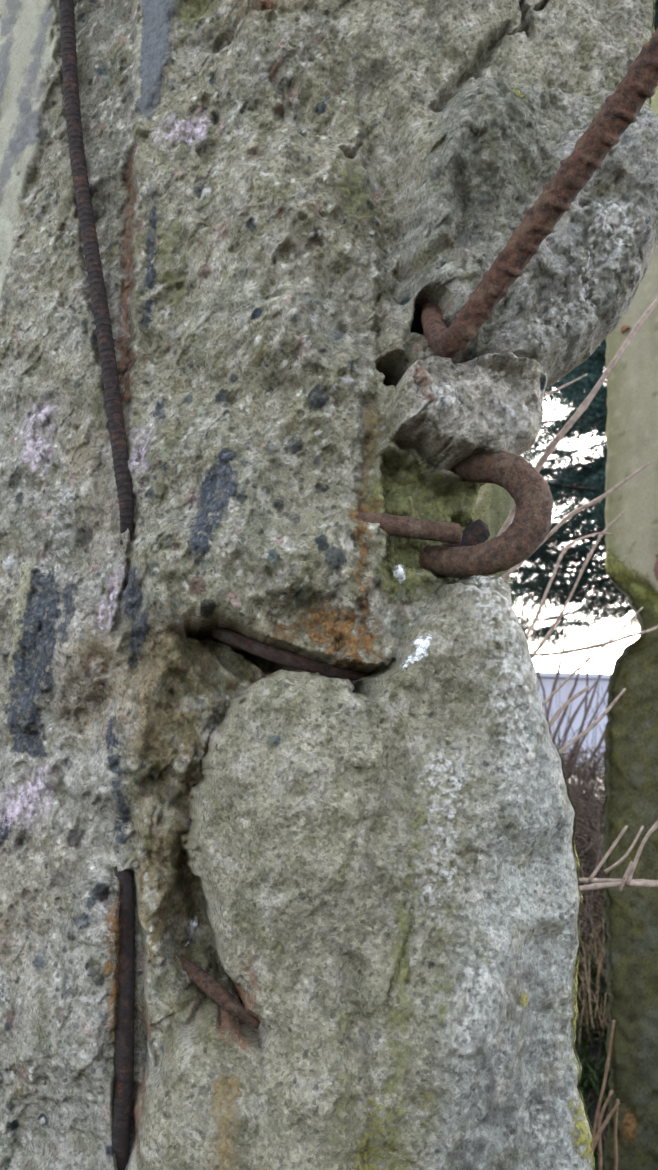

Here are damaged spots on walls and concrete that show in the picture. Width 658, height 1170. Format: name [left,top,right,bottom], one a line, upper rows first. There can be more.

spalling [421,27,658,358]
spalling [0,0,490,1170]
rust [273,406,404,679]
rust [104,882,122,1040]